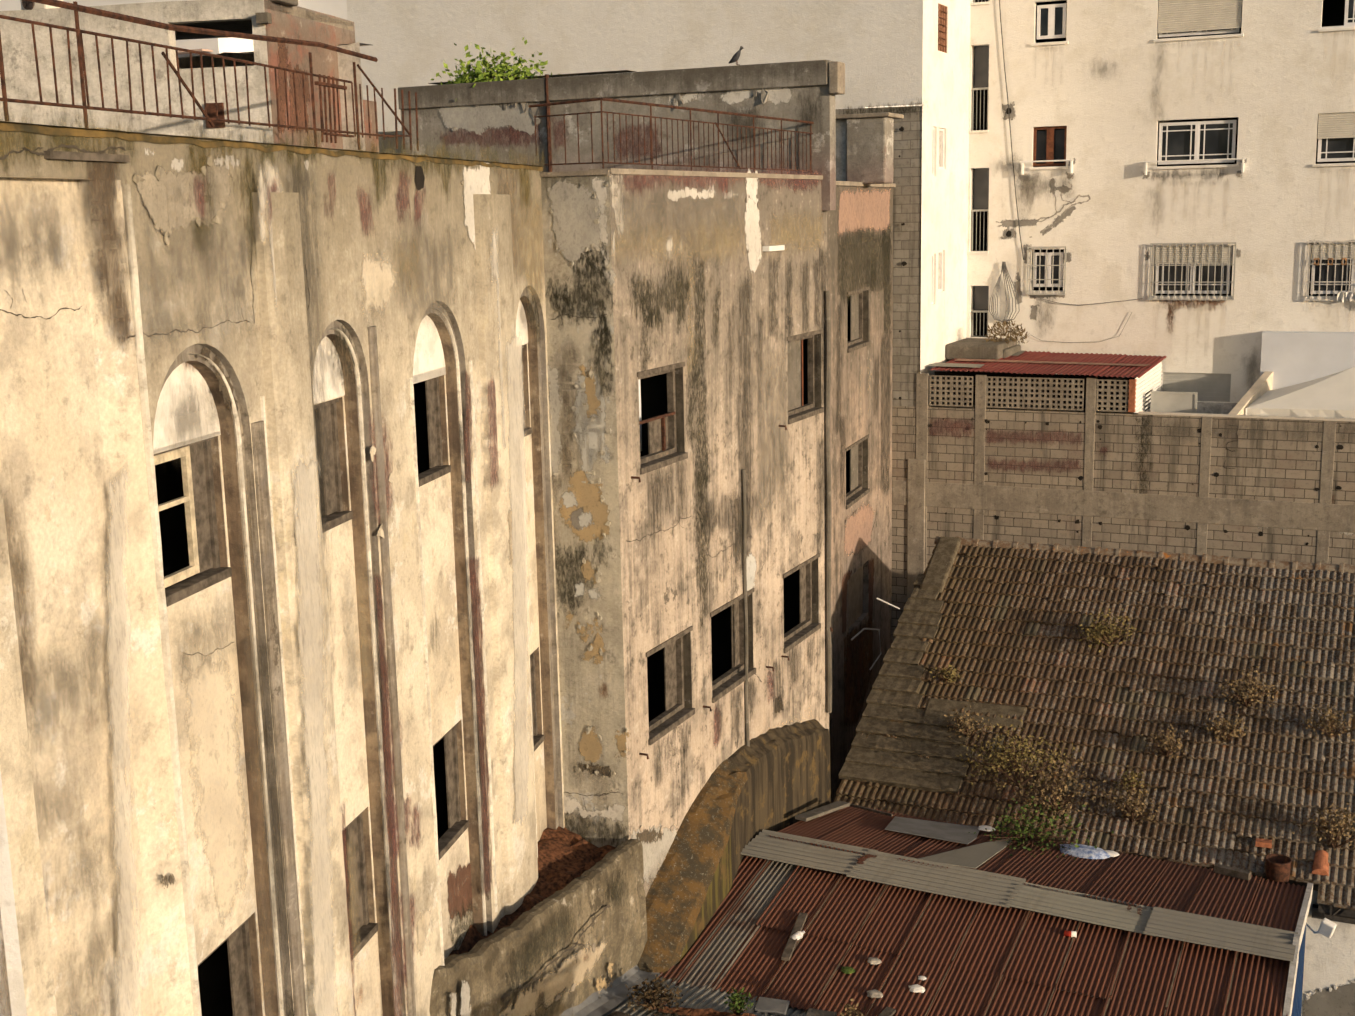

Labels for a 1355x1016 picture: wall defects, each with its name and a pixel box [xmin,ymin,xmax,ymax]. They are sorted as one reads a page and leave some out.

peeling [667,181,738,202]
crack [0,288,80,319]
water stain [464,372,472,483]
peeling [548,365,612,665]
water stain [488,168,822,823]
water stain [836,225,892,429]
water stain [451,558,492,951]